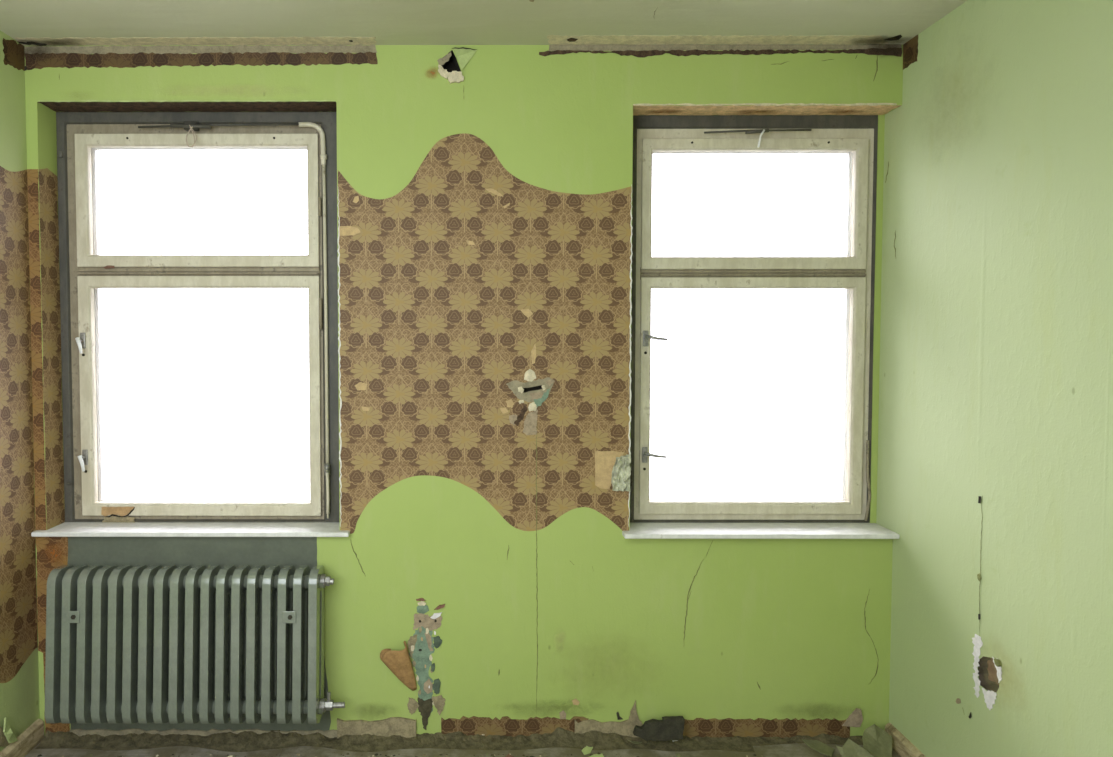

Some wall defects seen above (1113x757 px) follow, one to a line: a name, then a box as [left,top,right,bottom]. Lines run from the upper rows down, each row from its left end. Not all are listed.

flaking render [15,36,377,54]
spalling [429,47,477,84]
peeling [339,226,360,236]
spalling [500,345,555,435]
peeling [68,537,317,571]
crack [684,541,713,638]
peeling [70,598,445,738]
crack [864,590,879,681]
spalling [972,634,1002,710]